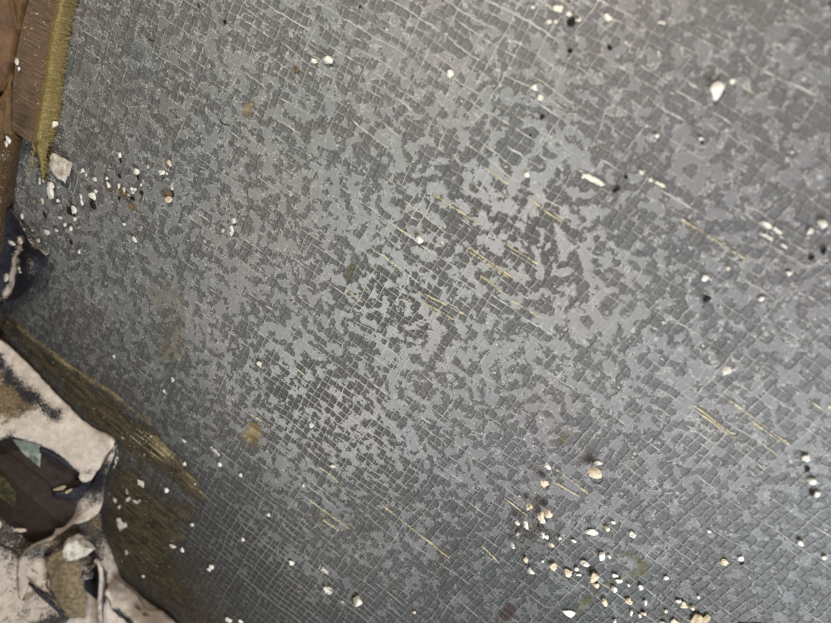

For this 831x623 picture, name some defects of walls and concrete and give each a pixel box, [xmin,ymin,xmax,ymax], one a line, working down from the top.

leakage [0,317,211,623]
peeling [109,490,141,532]